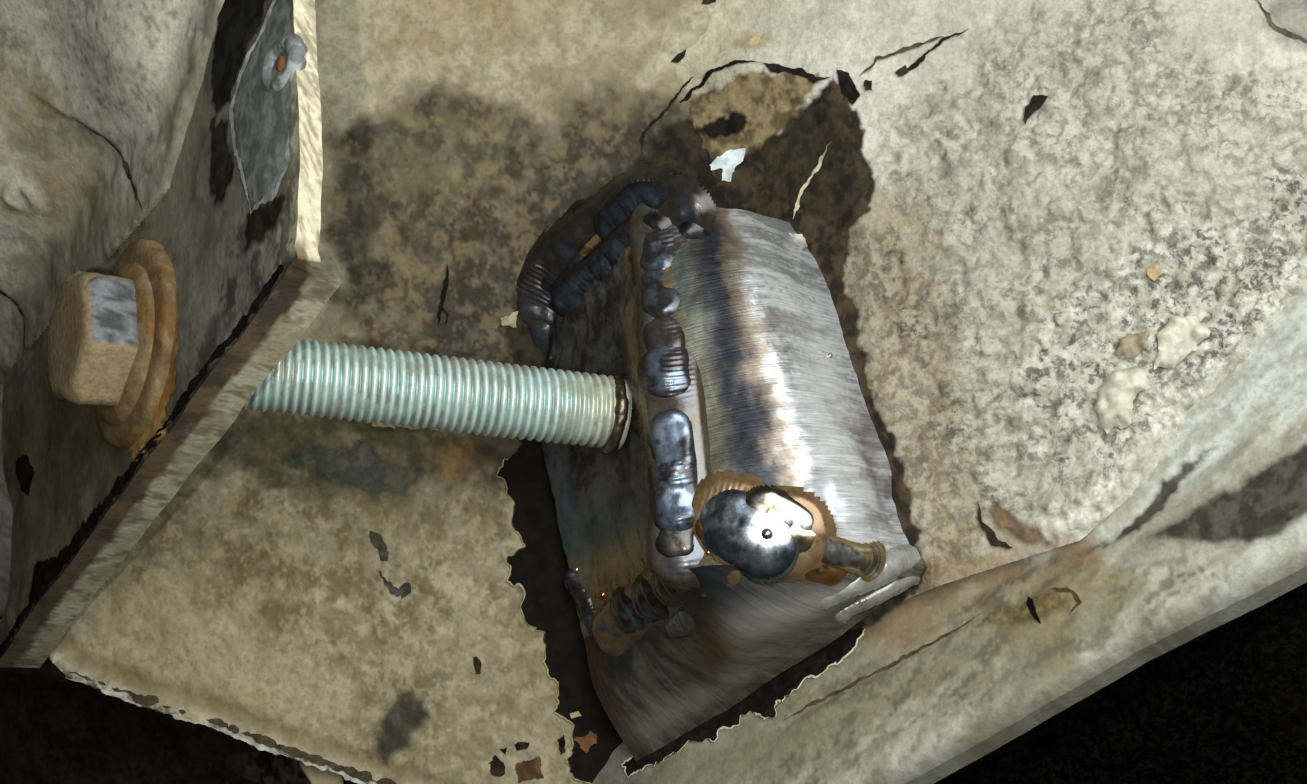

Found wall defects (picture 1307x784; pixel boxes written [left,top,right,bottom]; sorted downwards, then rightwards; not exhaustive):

crack [1257,0,1307,42]
crack [640,28,970,155]
peeling [836,68,860,104]
peeling [788,232,808,249]
peeling [501,311,518,328]
corrosion [128,319,179,460]
damp [1097,445,1307,547]
peeling [369,530,411,600]
peeling [496,437,865,784]
damp [378,692,428,761]
peeling [489,742,530,777]